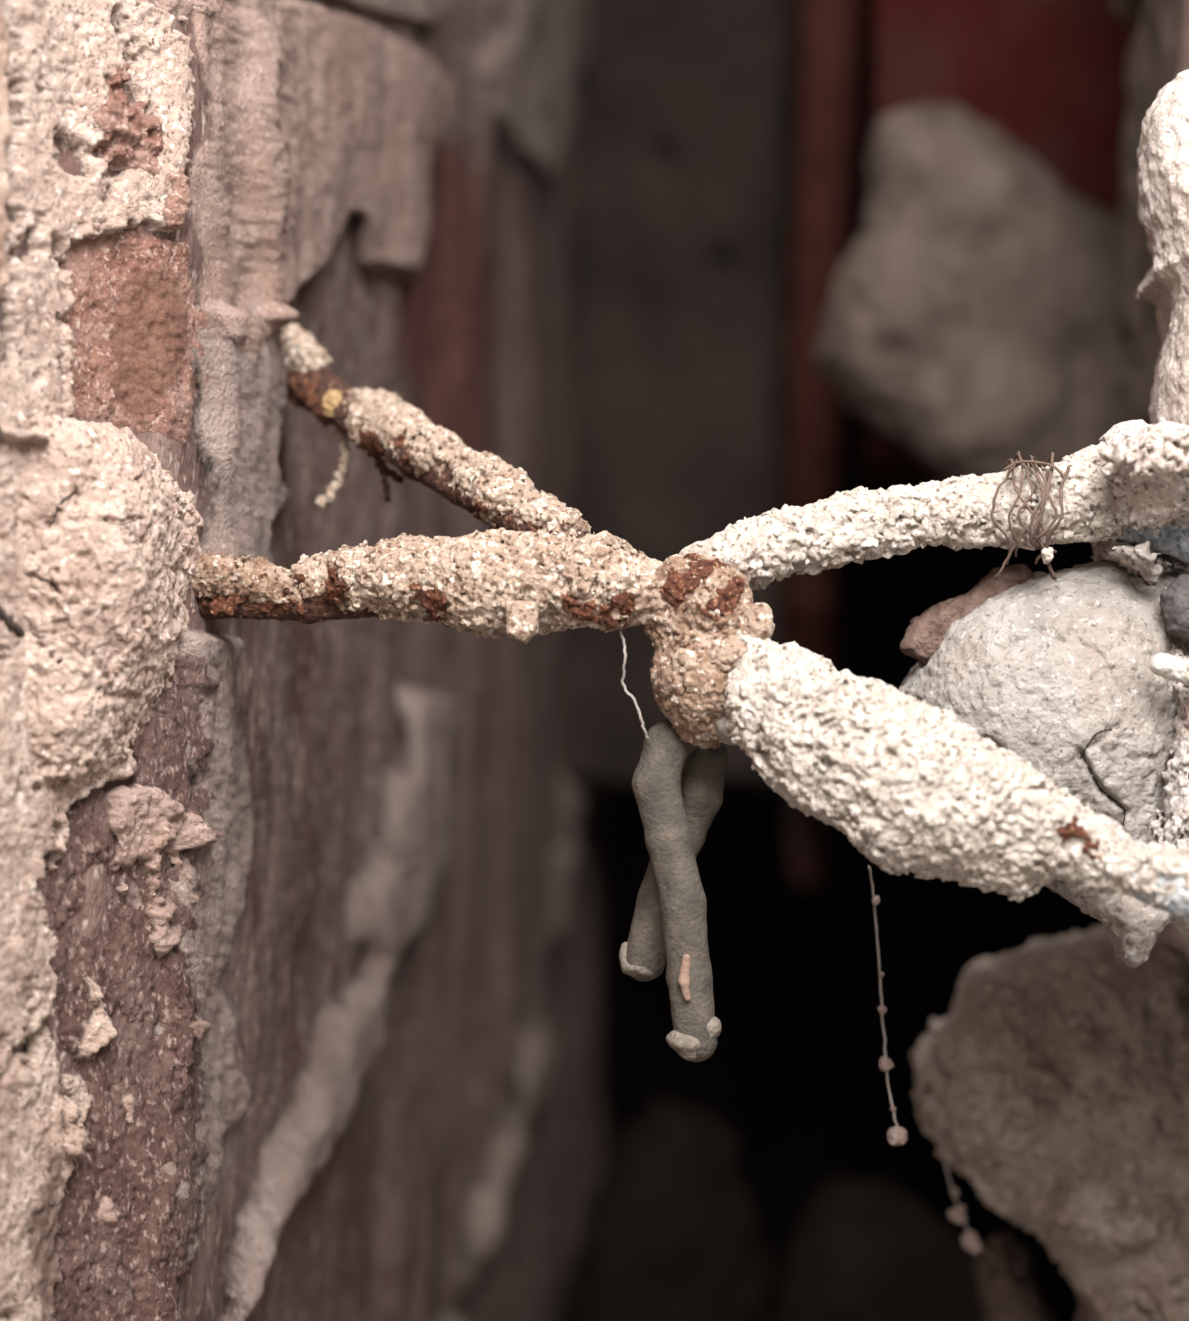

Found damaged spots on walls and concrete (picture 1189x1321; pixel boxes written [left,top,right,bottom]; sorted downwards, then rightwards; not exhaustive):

rust [285,369,333,427]
rust [355,428,410,470]
crack [44,490,76,528]
rust [472,501,558,534]
crack [0,606,62,638]
crack [33,575,62,596]
rust [201,567,353,617]
rust [409,582,452,627]
rust [561,591,635,632]
rust [660,553,745,621]
rust [1056,815,1102,861]
flaking render [44,654,224,1321]